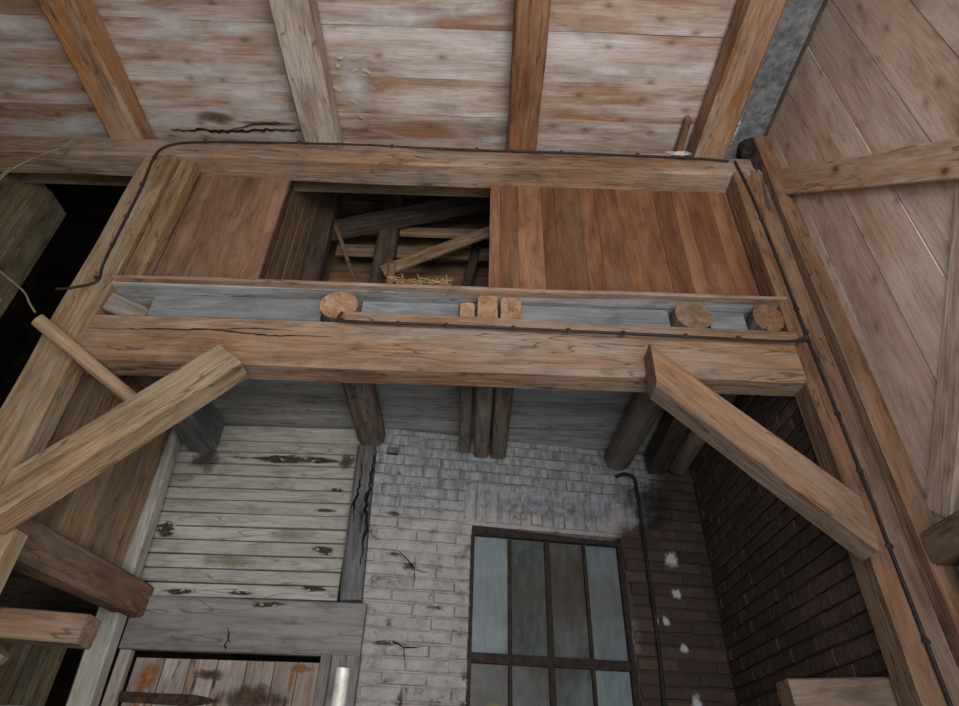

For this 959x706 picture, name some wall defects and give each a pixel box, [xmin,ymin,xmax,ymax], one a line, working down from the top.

crack [171,123,301,133]
peeling [235,454,356,464]
crack [351,455,375,564]